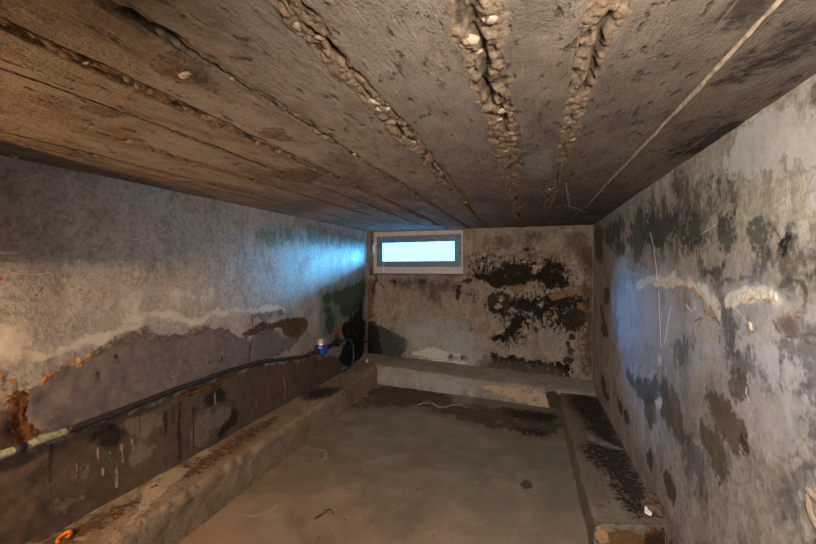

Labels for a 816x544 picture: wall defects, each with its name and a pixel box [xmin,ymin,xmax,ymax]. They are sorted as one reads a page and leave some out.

leakage [716,0,767,31]
leakage [712,22,816,86]
leakage [666,97,816,252]
flaking render [41,325,210,385]
flaking render [242,309,308,338]
leakage [0,171,816,544]
flaking render [0,379,40,445]